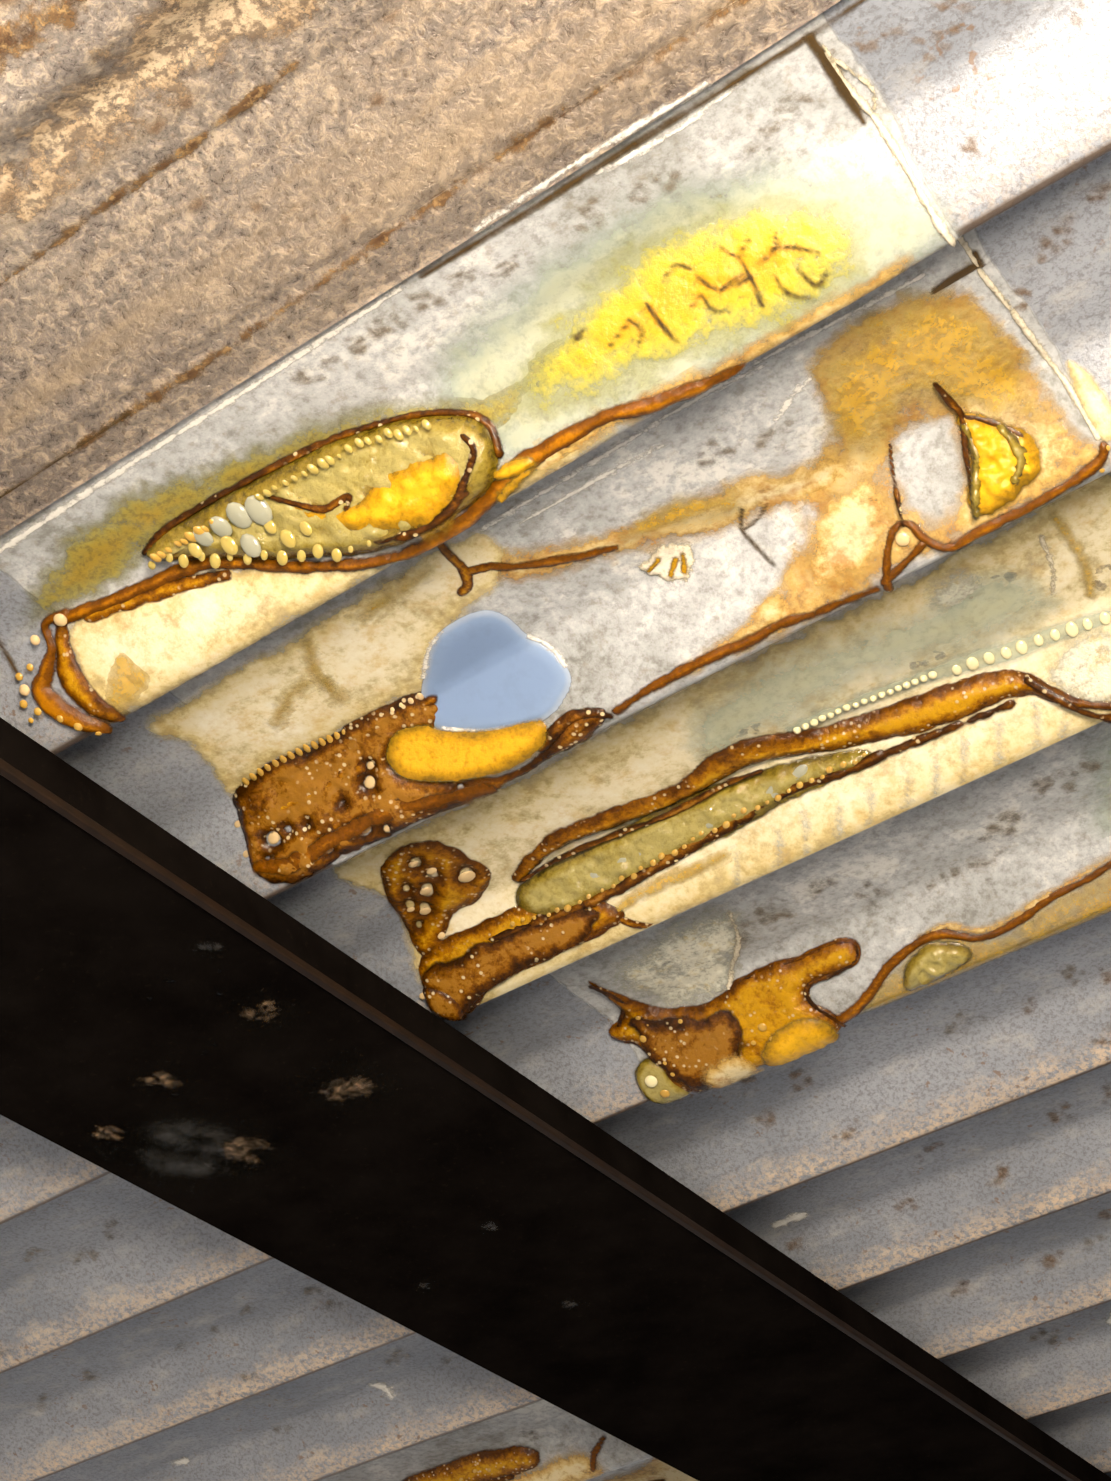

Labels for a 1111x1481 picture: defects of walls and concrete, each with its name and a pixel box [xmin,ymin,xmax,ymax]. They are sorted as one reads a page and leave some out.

water stain [15,179,1111,1104]
water stain [403,1436,698,1481]